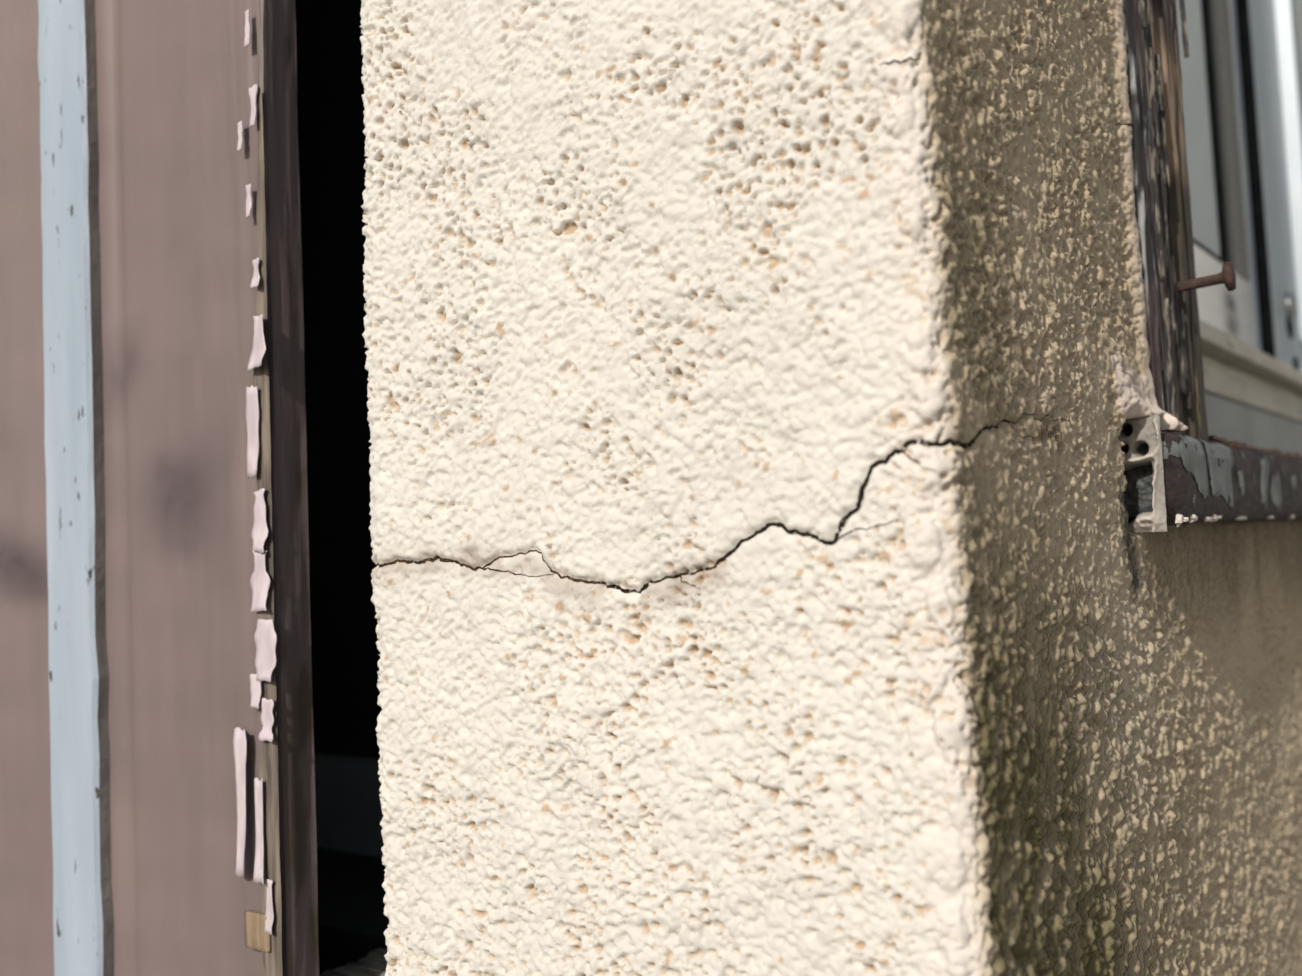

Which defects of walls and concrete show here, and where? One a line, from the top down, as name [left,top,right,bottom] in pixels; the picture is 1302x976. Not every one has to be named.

peeling [233,0,282,976]
crack [376,414,1069,593]
spalling [1109,0,1297,533]